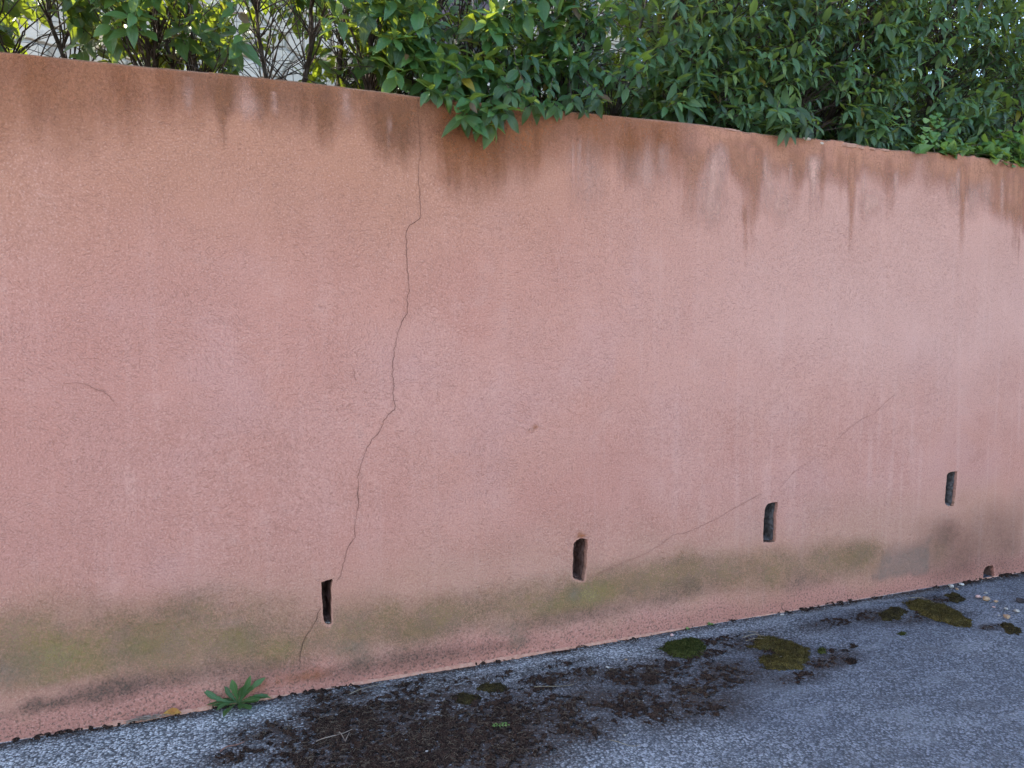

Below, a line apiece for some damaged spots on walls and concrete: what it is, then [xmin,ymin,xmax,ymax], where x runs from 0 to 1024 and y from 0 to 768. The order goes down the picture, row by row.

leakage [187,72,425,145]
leakage [438,101,1024,224]
leakage [26,679,157,710]